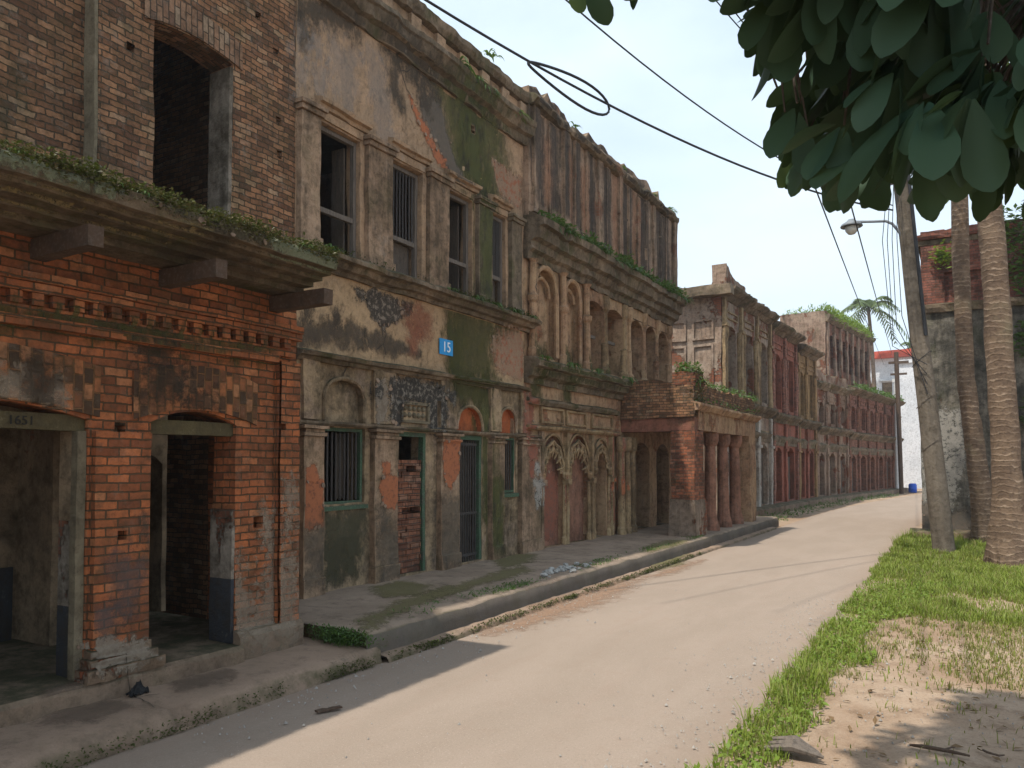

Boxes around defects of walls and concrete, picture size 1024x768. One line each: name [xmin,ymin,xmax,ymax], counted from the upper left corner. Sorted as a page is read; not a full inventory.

spalling [354,286,414,331]
flaking render [369,375,462,489]
flaking render [305,463,325,532]
flaking render [379,461,398,510]